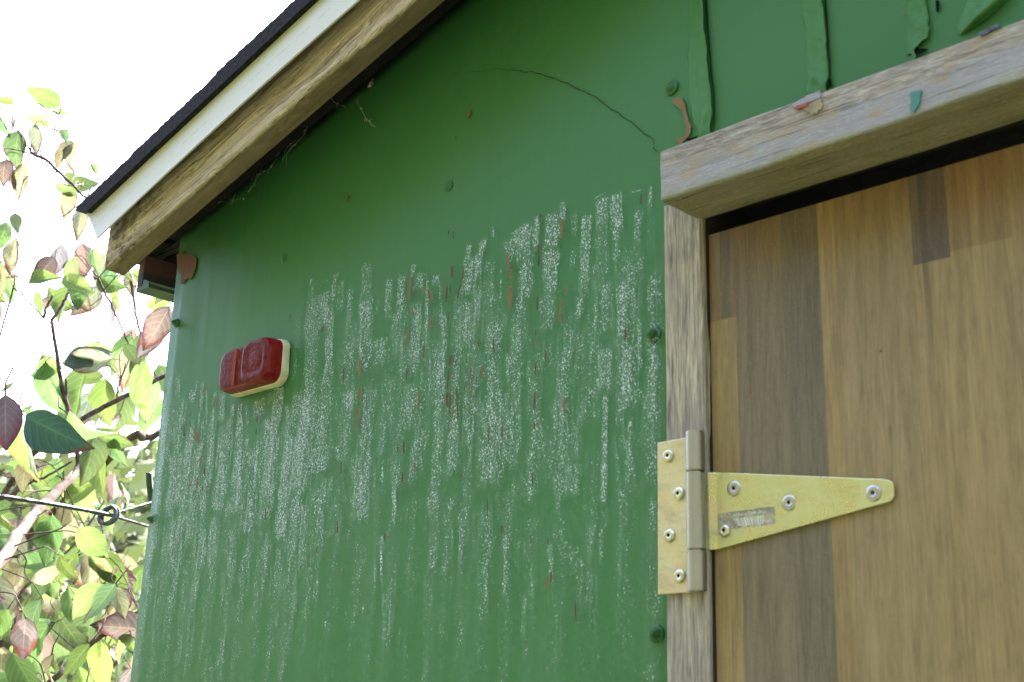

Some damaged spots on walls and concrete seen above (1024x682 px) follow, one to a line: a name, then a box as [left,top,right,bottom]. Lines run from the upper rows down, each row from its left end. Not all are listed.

peeling [978,23,1002,37]
crack [456,68,658,152]
peeling [672,97,692,144]
peeling [177,251,197,284]
leakage [132,187,664,680]